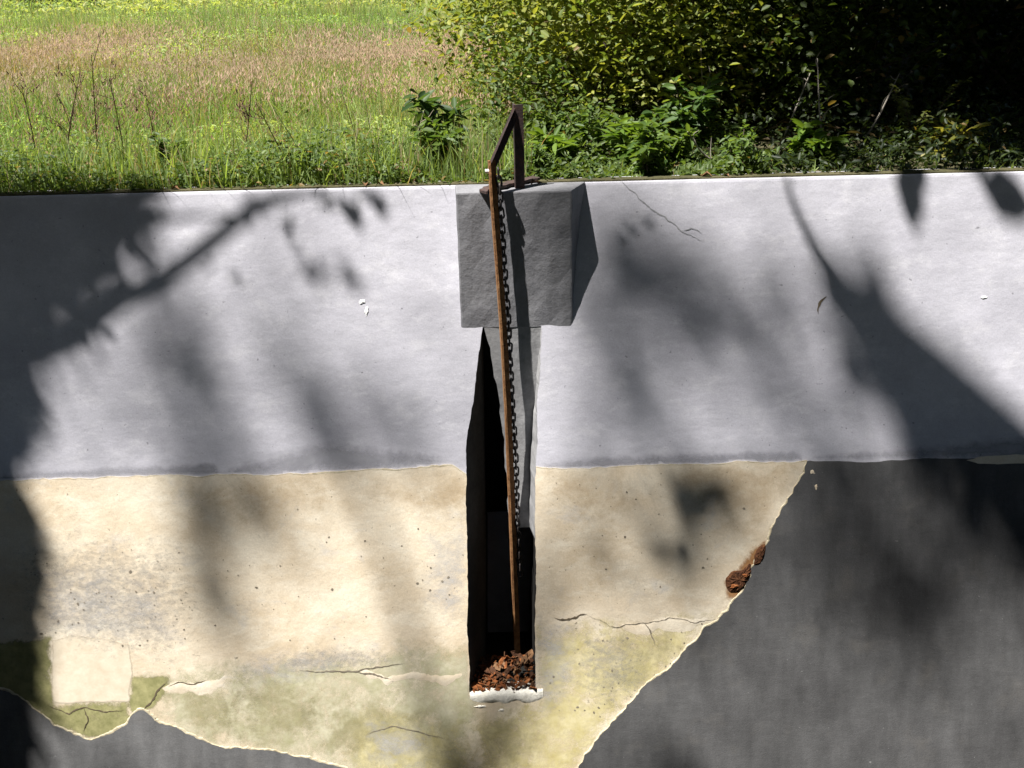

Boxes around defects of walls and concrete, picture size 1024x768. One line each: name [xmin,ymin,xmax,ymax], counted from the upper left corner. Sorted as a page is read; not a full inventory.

crack [627,187,703,241]
peeling [968,454,1024,464]
peeling [0,460,817,768]
crack [556,614,714,644]
crack [299,663,404,679]
crack [52,681,203,732]